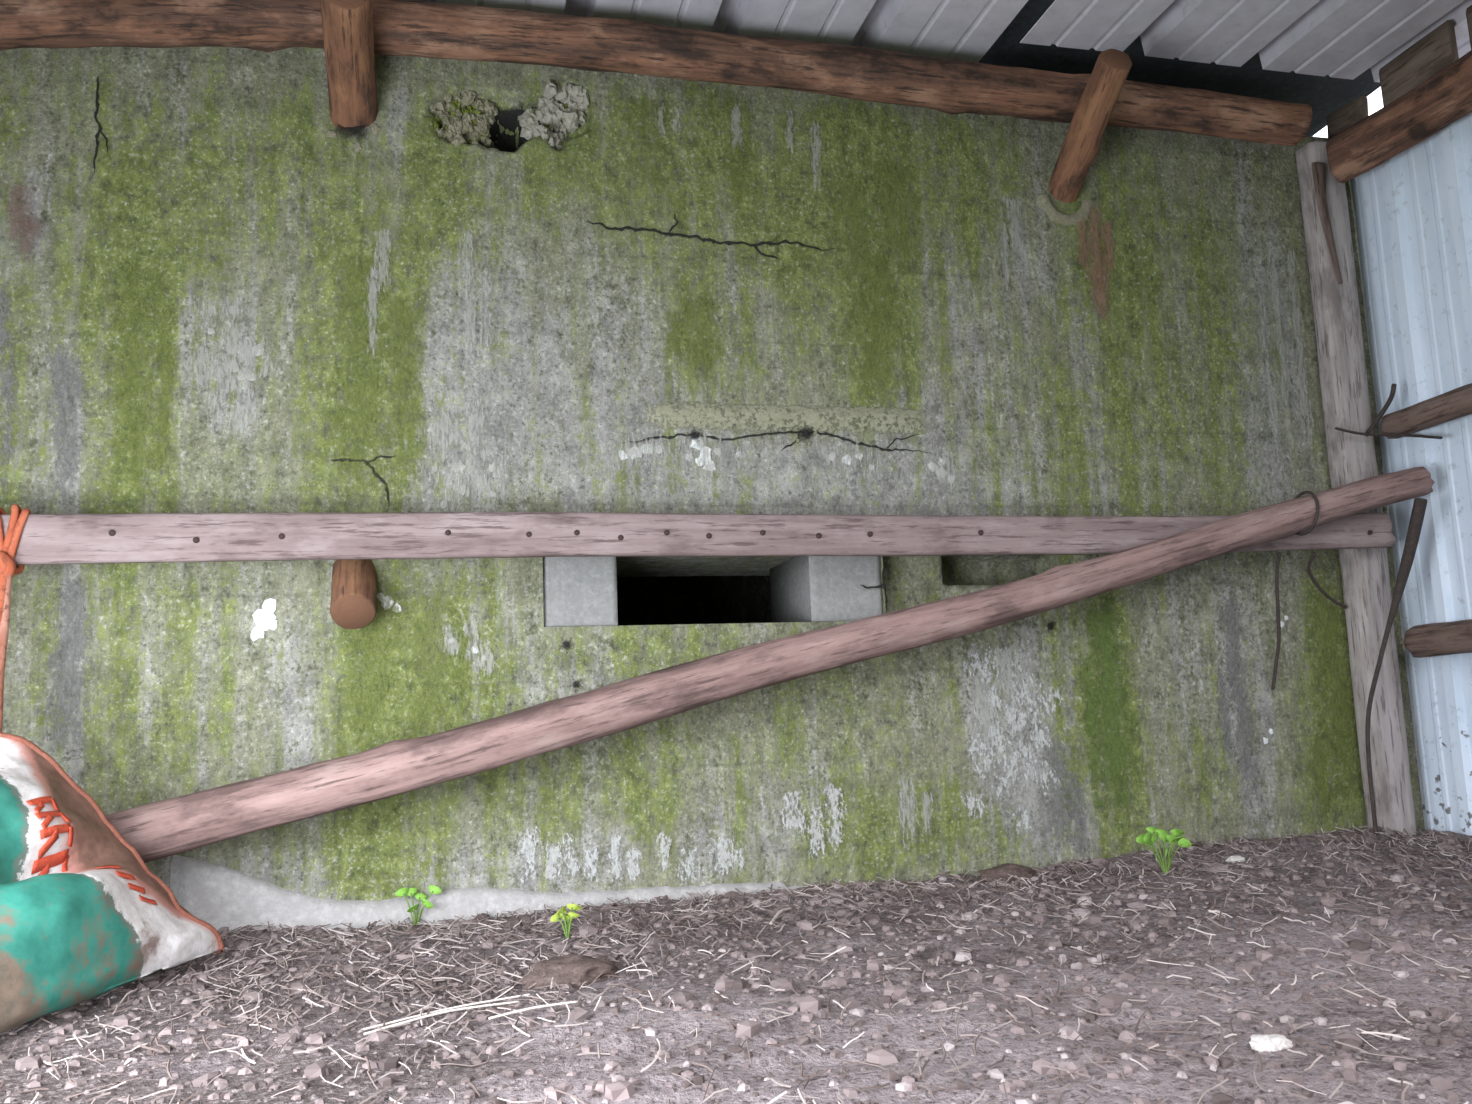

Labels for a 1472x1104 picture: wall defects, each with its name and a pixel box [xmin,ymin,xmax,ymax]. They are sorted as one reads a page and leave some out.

spalling [430,79,590,152]
crack [587,213,845,261]
leakage [1001,197,1023,282]
leakage [460,233,491,358]
leakage [327,229,424,498]
leakage [1254,242,1313,476]
crack [621,430,949,458]
leakage [1043,595,1136,849]
leakage [518,827,641,883]
leakage [657,833,744,880]
leakage [781,784,844,855]
leakage [899,780,933,837]